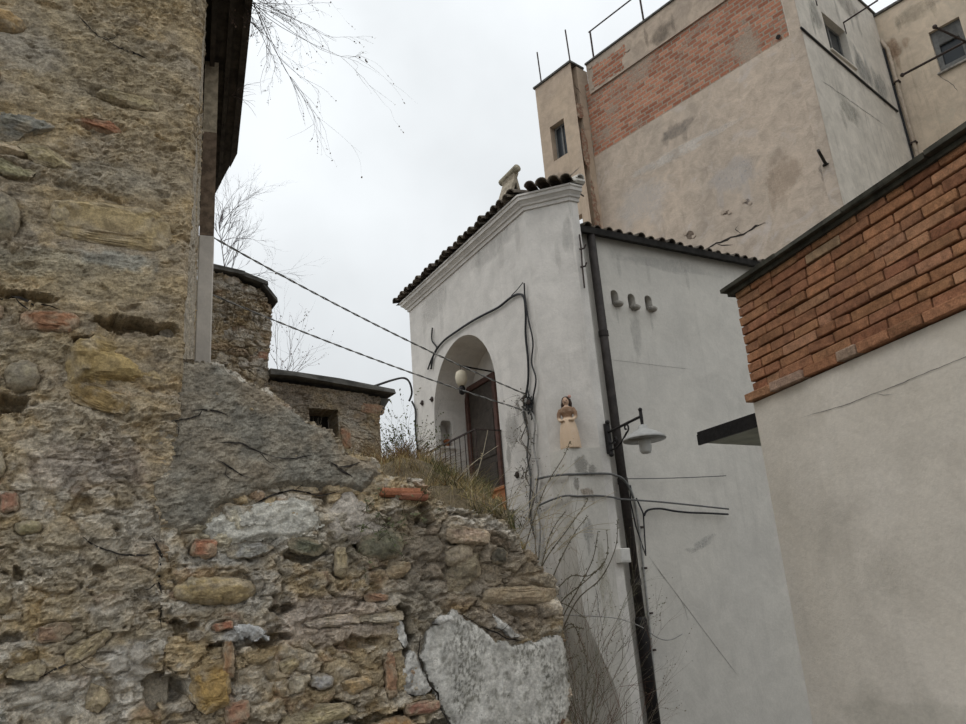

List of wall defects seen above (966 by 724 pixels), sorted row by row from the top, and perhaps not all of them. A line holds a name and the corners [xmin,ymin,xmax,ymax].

crack [706,224,762,249]
crack [808,357,965,416]